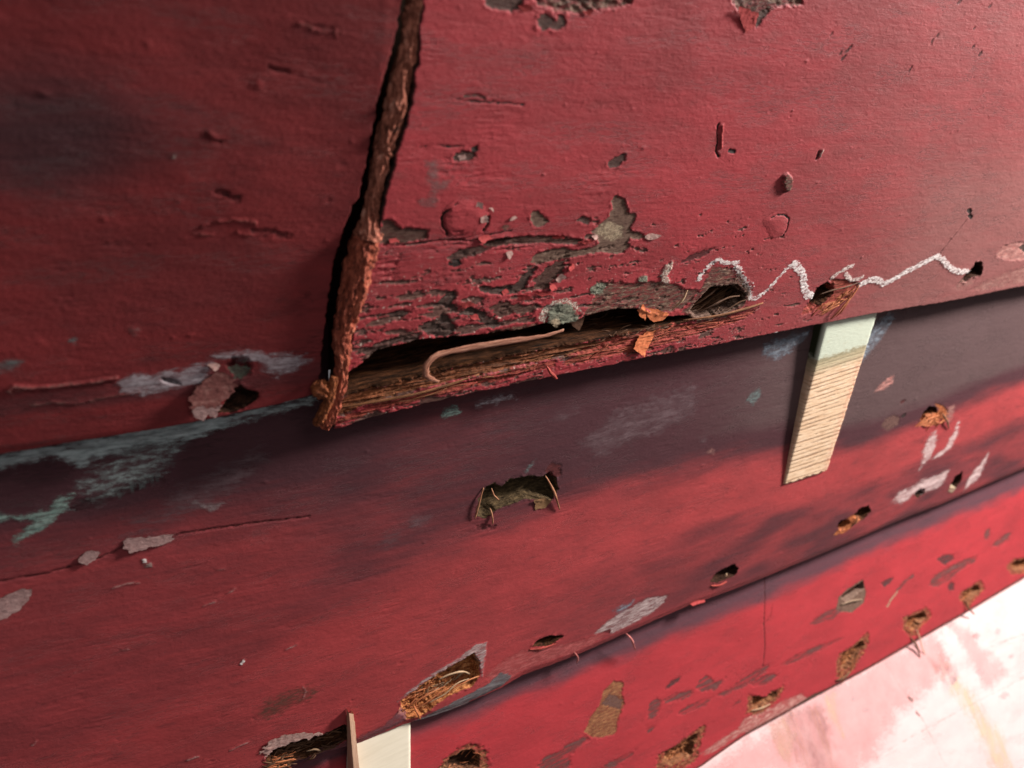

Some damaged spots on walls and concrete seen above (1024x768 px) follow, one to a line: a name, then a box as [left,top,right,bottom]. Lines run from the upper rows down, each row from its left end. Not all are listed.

peeling [485,0,631,30]
spalling [344,195,747,396]
peeling [188,358,259,421]
peeling [35,550,111,575]
peeling [123,528,210,553]
hole [477,473,559,519]
hole [837,506,871,527]
spalling [399,596,666,719]
peeling [648,554,1024,768]
peeling [540,681,624,768]